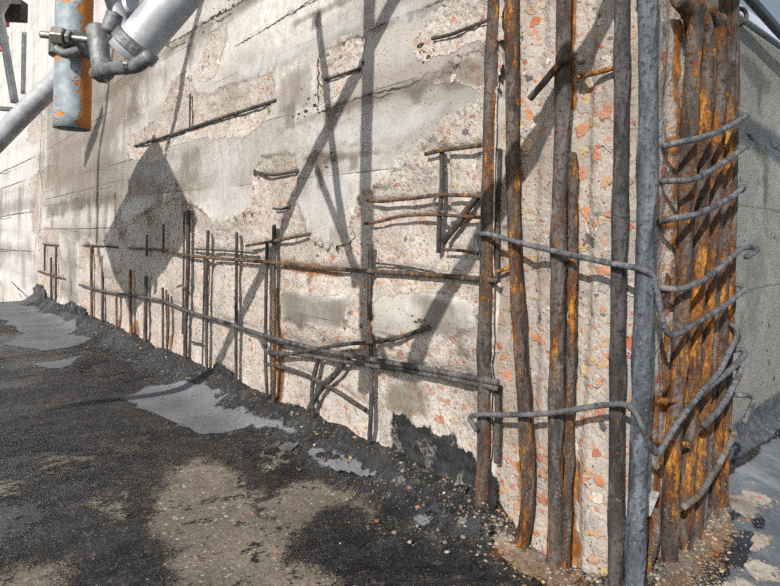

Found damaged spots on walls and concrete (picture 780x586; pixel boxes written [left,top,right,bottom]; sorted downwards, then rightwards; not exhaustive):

peeling [0,281,93,351]
spalling [28,164,66,303]
leakage [48,75,128,206]
leakage [283,292,342,328]
leakage [330,178,347,209]
spalling [61,0,740,506]
leakage [424,298,445,327]
corrosion [654,270,672,308]
corrosion [665,22,683,196]
corrosion [563,456,581,568]
spalling [494,372,780,586]
corrosion [653,453,663,509]